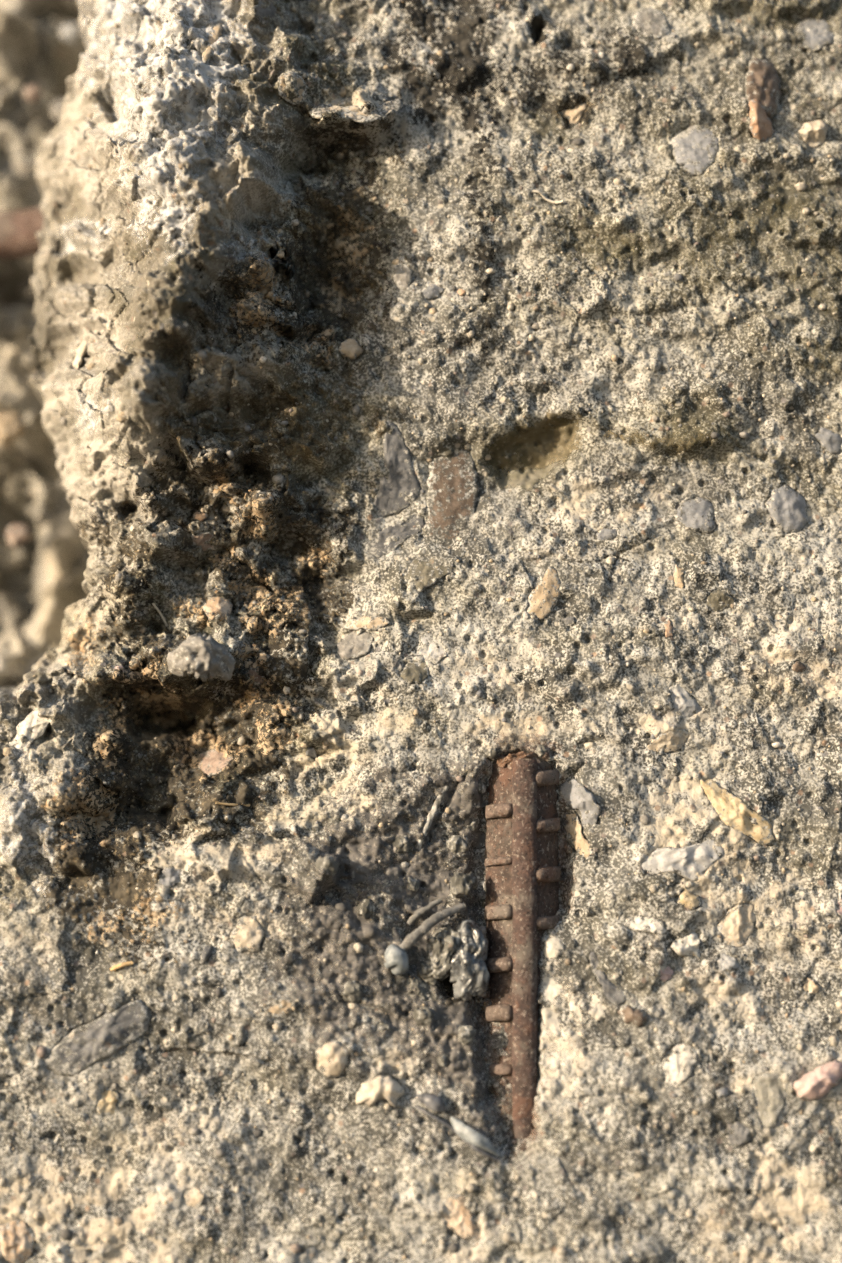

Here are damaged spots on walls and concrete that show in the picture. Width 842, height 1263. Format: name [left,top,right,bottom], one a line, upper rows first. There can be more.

leakage [0,0,656,978]
spalling [255,729,523,1162]
rust [477,733,572,1151]
peeling [537,935,607,1124]